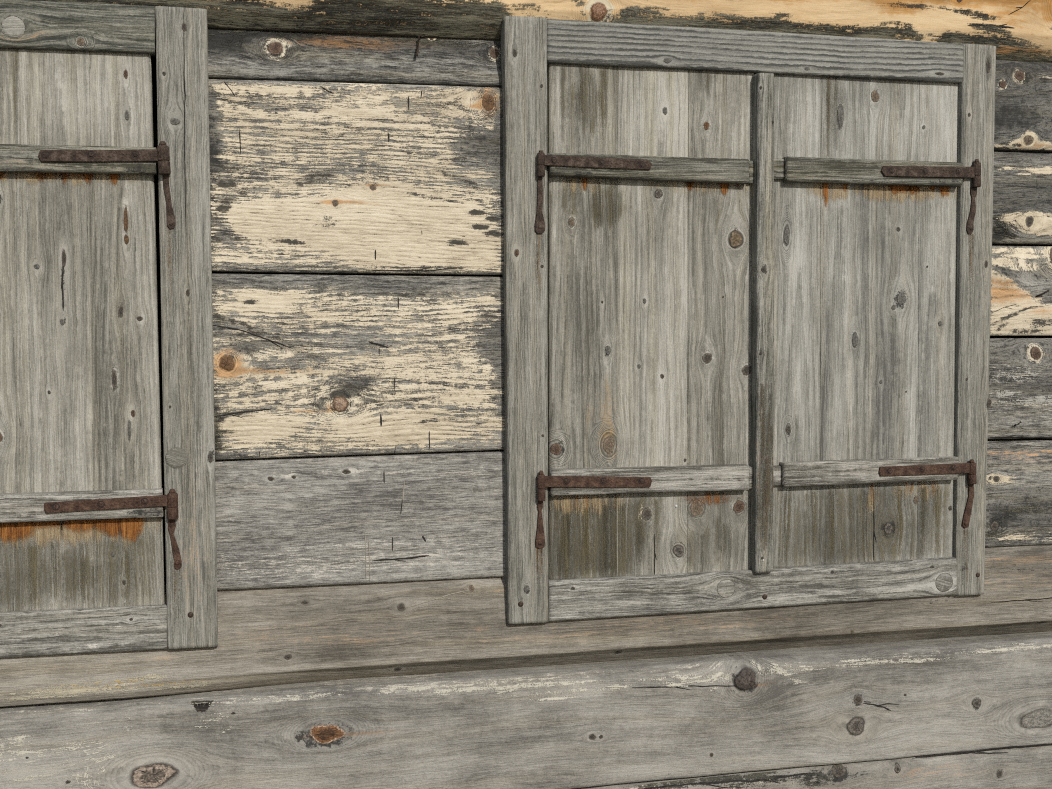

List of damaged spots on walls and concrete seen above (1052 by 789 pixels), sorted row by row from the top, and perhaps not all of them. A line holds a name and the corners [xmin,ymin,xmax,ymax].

peeling [994,130,1052,150]
rust [0,172,140,184]
peeling [209,81,504,274]
rust [668,181,734,194]
rust [810,183,957,206]
peeling [999,166,1052,175]
peeling [996,211,1052,236]
peeling [990,247,1052,335]
peeling [212,285,505,457]
peeling [990,367,1052,411]
rust [555,494,620,516]
rust [0,518,162,547]